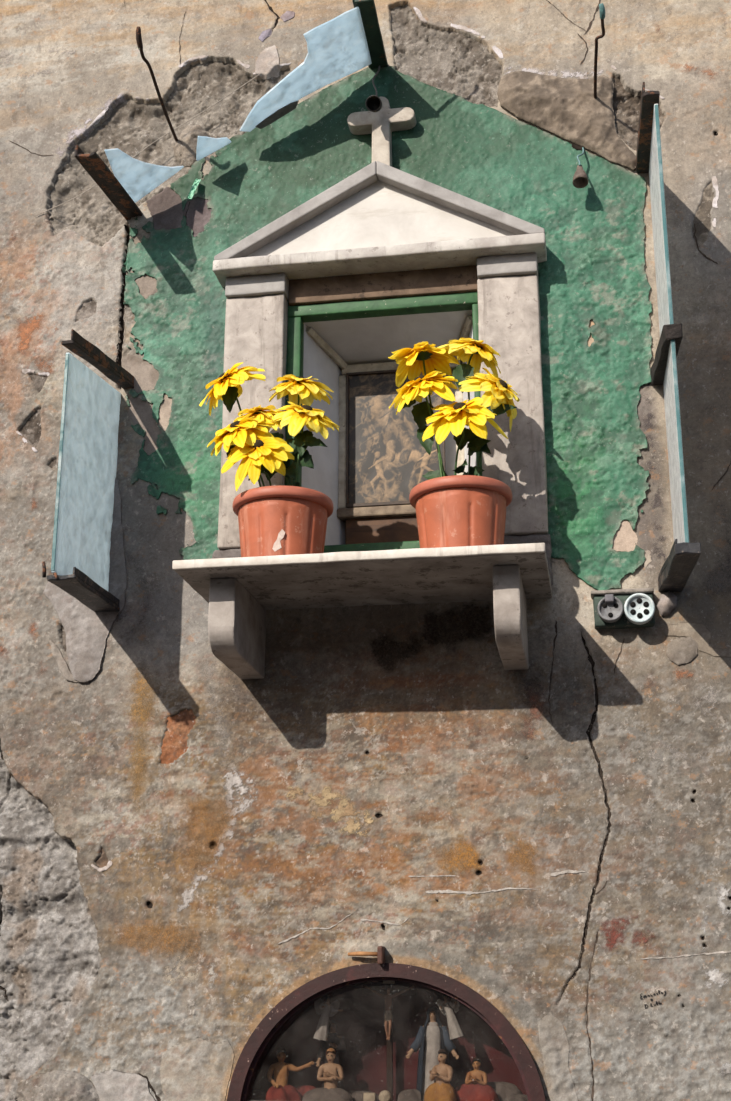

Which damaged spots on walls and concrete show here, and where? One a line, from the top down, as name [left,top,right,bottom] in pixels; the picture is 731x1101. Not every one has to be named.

crack [264,0,280,31]
spalling [390,4,503,107]
crack [547,0,600,65]
spalling [49,28,291,247]
spalling [611,65,665,151]
peeling [135,274,157,299]
peeling [121,354,172,455]
peeling [612,520,652,567]
flaking render [50,625,81,683]
spalling [160,709,196,764]
crack [548,621,624,1101]
spalling [0,748,112,1101]